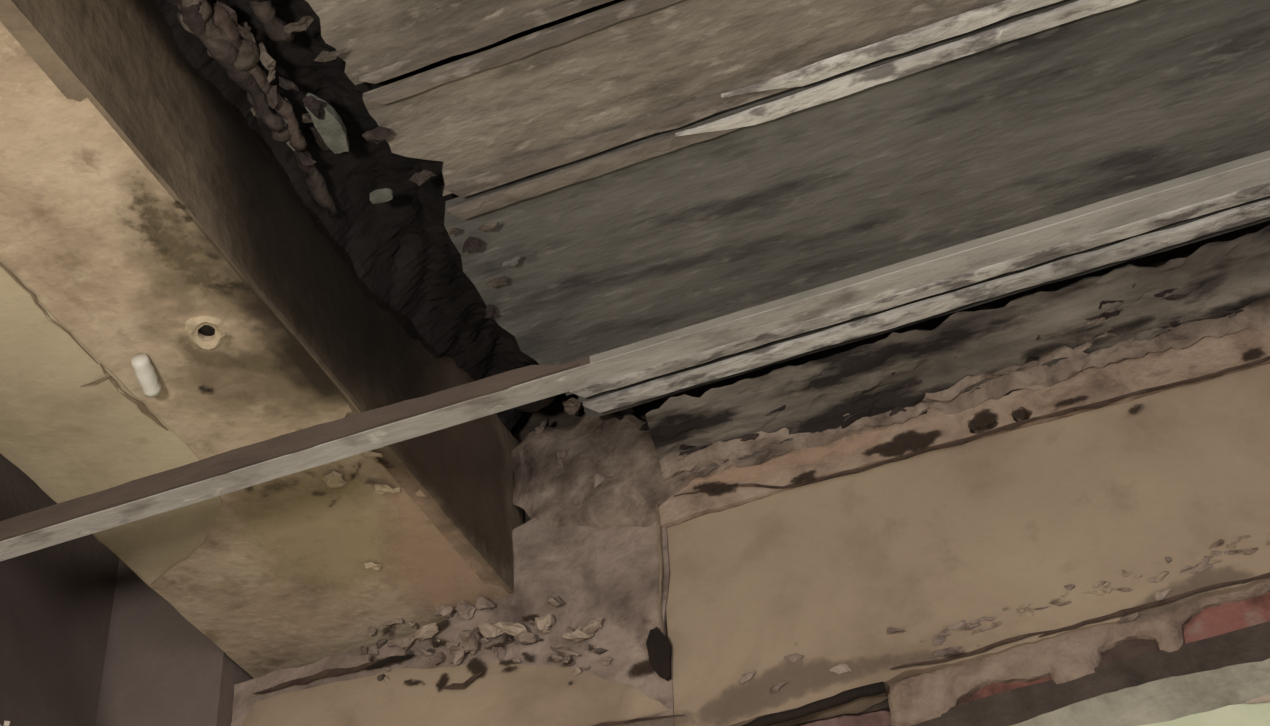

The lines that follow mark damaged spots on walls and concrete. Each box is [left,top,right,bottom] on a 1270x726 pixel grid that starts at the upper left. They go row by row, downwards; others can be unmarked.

spalling [151,0,539,381]
crack [0,263,168,431]
spalling [496,225,1270,529]
spalling [1016,535,1270,618]
spalling [919,616,1003,659]
flaking render [1099,639,1160,667]
flaking render [1183,592,1270,644]
spalling [741,682,891,726]
flaking render [956,677,1051,706]